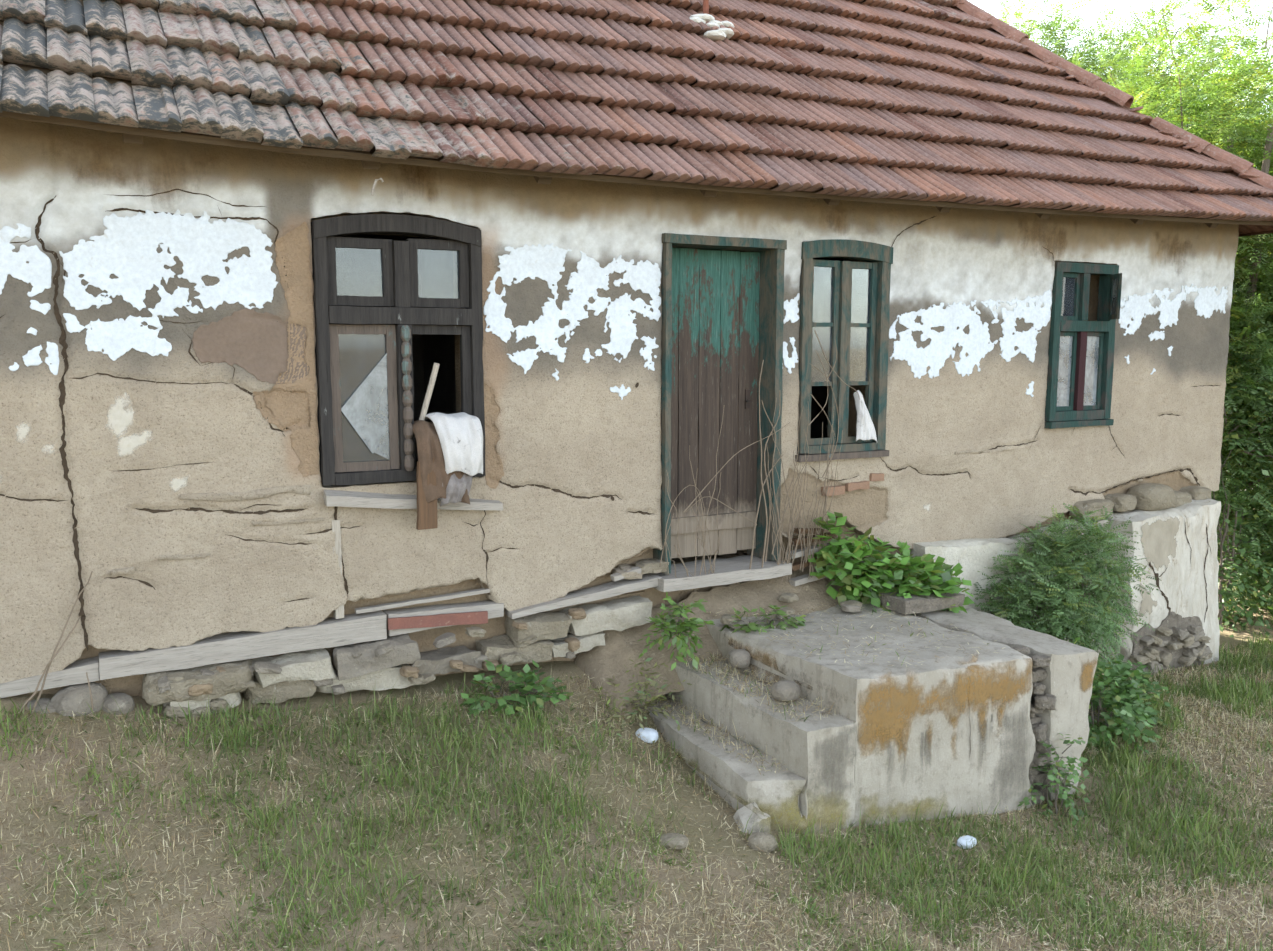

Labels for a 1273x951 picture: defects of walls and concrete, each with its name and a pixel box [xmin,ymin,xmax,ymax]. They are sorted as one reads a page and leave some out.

peeling [0,209,319,477]
peeling [483,243,661,381]
peeling [889,289,1052,379]
peeling [1118,283,1228,356]
crack [0,189,295,651]
peeling [610,383,639,400]
crack [810,426,1041,503]
crack [1070,427,1200,496]
crack [1145,520,1211,623]